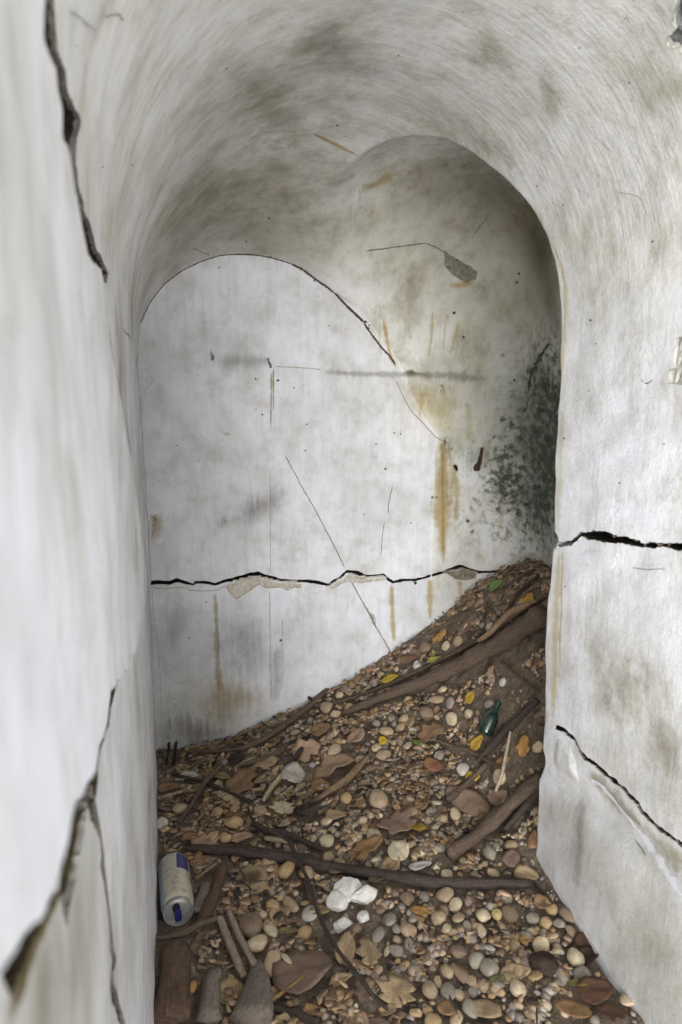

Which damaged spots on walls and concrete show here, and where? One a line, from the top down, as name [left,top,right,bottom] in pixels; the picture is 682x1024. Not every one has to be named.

crack [44,0,124,283]
spalling [444,251,478,283]
crack [397,383,444,442]
damp [493,344,561,549]
crack [150,455,498,653]
crack [559,530,682,570]
crack [0,684,125,1024]
crack [544,725,682,856]